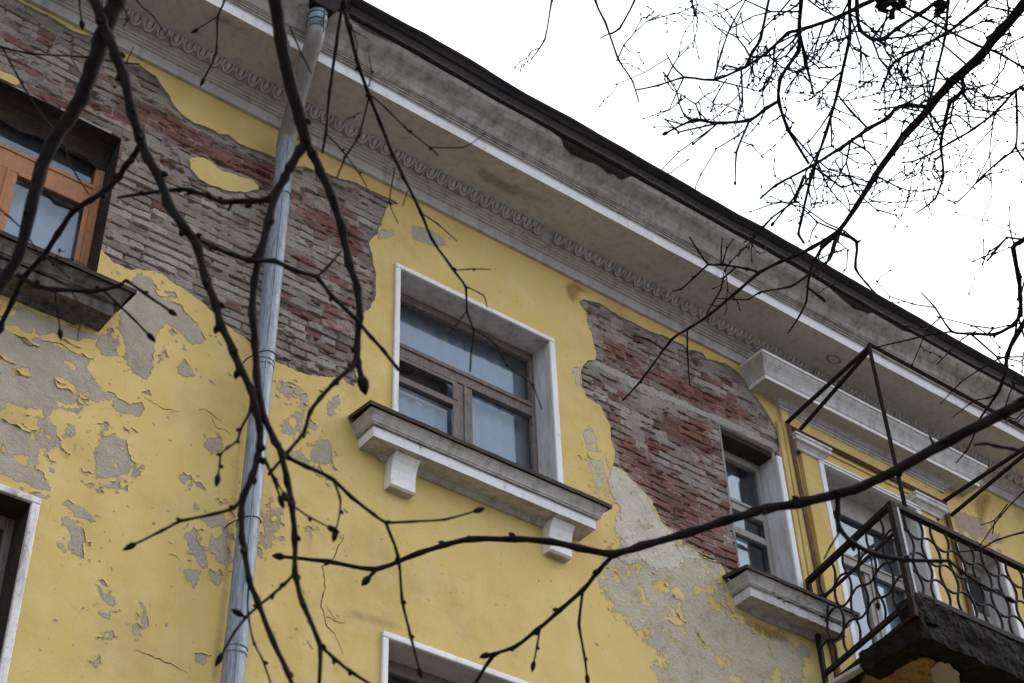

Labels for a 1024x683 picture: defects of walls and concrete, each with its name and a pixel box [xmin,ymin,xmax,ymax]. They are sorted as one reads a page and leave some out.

flaking render [0,0,92,111]
flaking render [0,49,276,499]
flaking render [273,166,398,487]
peeling [57,498,99,565]
peeling [179,470,236,601]
peeling [257,497,286,560]
flaking render [572,299,811,683]
peeling [81,578,121,644]
spalling [931,662,961,683]